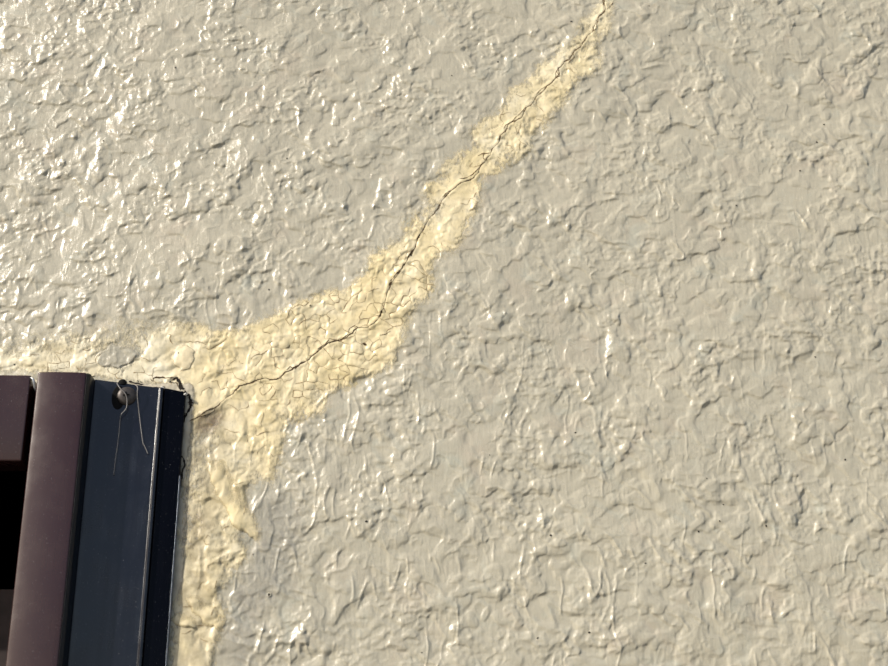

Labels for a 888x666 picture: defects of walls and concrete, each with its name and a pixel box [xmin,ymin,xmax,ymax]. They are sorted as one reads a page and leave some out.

crack [28,0,613,457]
crack [182,506,245,642]